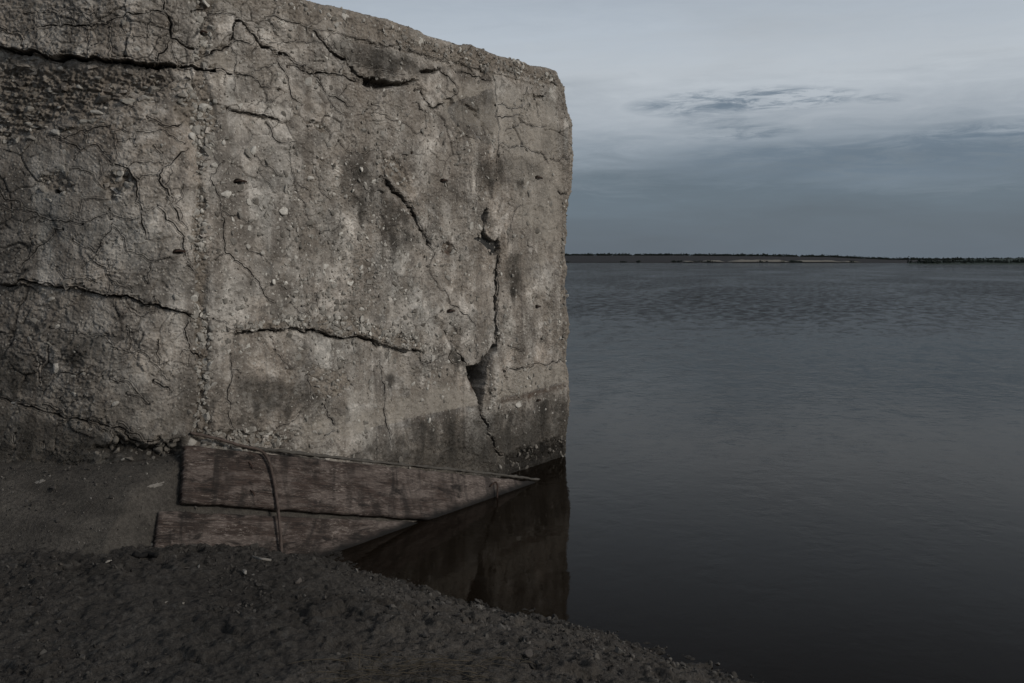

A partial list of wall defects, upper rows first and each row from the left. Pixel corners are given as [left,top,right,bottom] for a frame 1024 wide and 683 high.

spalling [0,0,568,478]
crack [0,0,570,458]